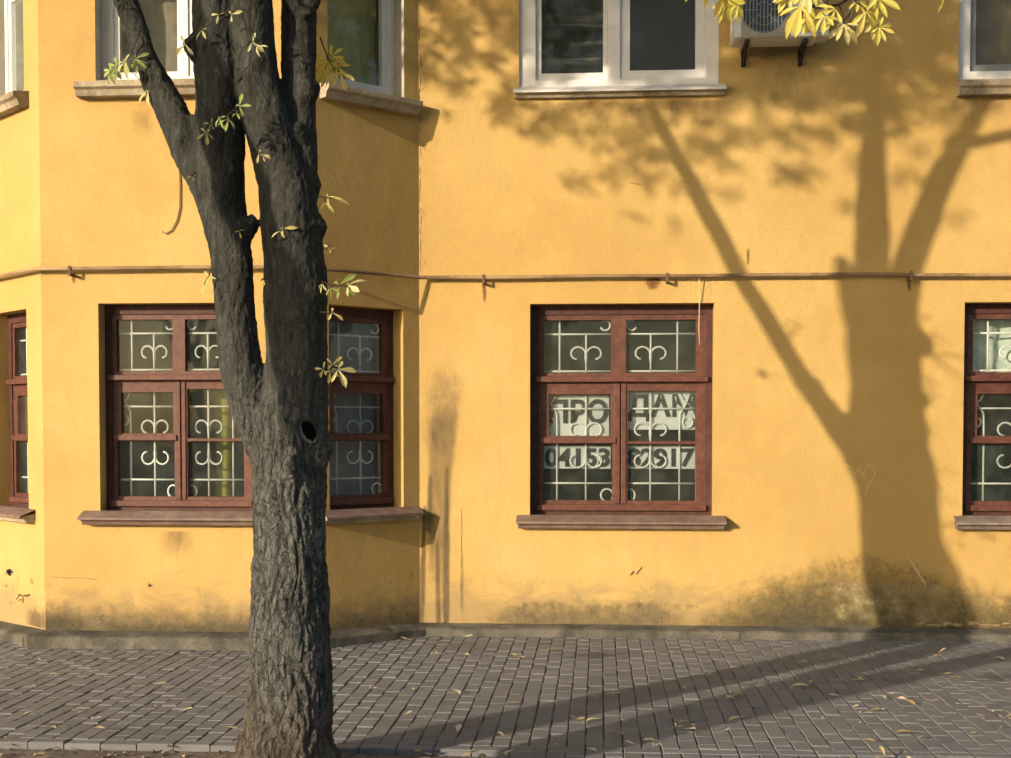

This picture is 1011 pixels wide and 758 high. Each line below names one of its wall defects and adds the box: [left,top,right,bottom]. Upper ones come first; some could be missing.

water stain [331,417,453,630]
water stain [510,609,669,625]
water stain [710,573,1011,629]